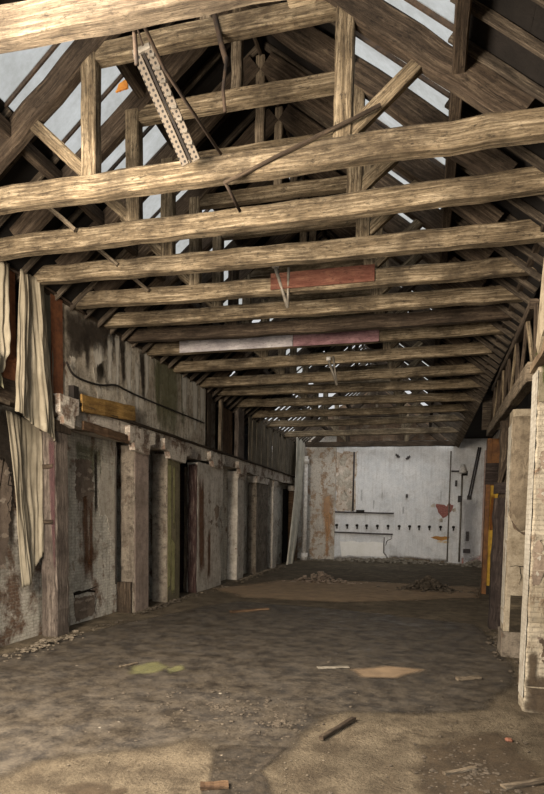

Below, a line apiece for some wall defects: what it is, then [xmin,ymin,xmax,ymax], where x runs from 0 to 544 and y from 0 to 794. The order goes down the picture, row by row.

leakage [66,311,159,416]
leakage [181,374,205,428]
rust [82,452,97,576]
rust [323,496,331,554]
peeling [431,503,456,522]
spalling [531,539,544,586]